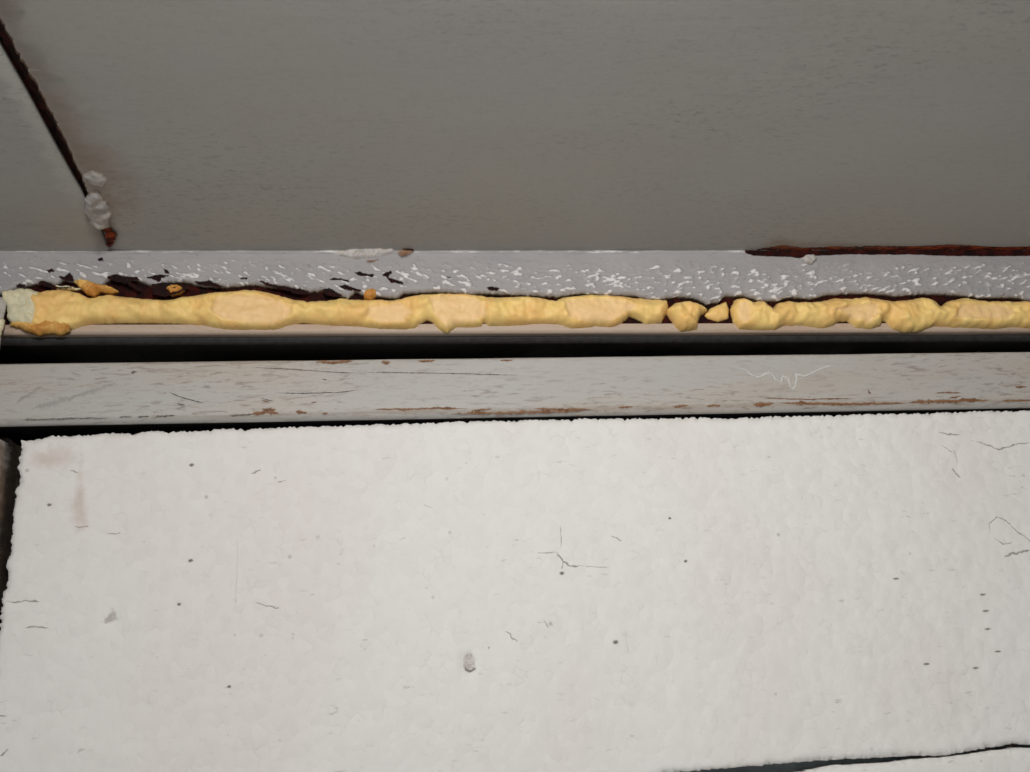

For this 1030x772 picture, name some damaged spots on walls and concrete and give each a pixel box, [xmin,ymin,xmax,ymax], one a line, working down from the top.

rust [745,245,1030,258]
peeling [16,269,223,298]
peeling [260,281,309,295]
peeling [323,271,403,300]